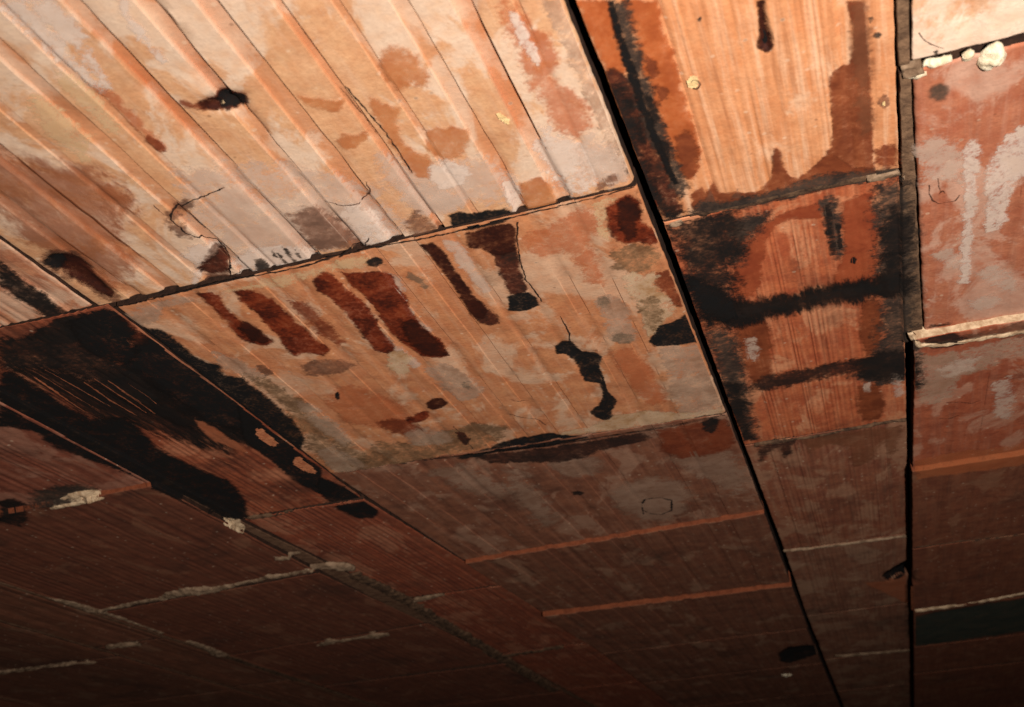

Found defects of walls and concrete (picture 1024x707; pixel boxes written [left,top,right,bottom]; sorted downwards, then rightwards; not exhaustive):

rust [197,290,345,356]
crack [114,187,634,308]
rust [313,257,450,358]
rust [421,224,539,325]
damp [0,0,1024,527]
crack [611,476,694,522]